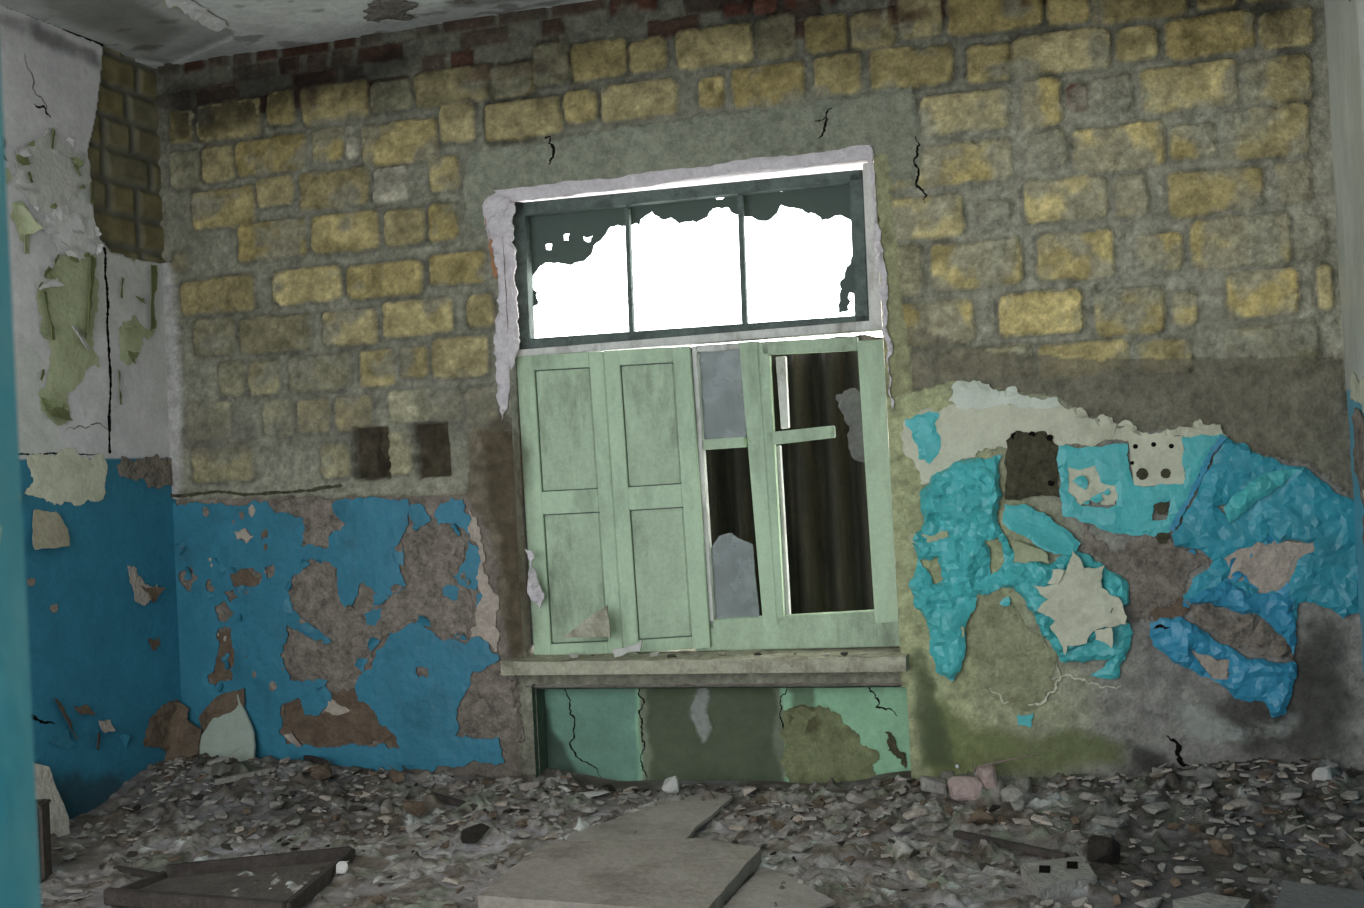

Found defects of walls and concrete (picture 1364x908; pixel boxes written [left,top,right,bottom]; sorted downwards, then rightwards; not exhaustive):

crack [913,136,927,204]
peeling [4,128,105,426]
peeling [482,145,894,421]
crack [19,247,112,456]
peeling [21,448,173,506]
peeling [525,549,545,608]
peeling [900,373,1364,717]
peeling [49,495,525,772]
crack [564,689,602,778]
crack [638,688,647,780]
crack [1167,735,1189,767]
water stain [1182,705,1242,740]